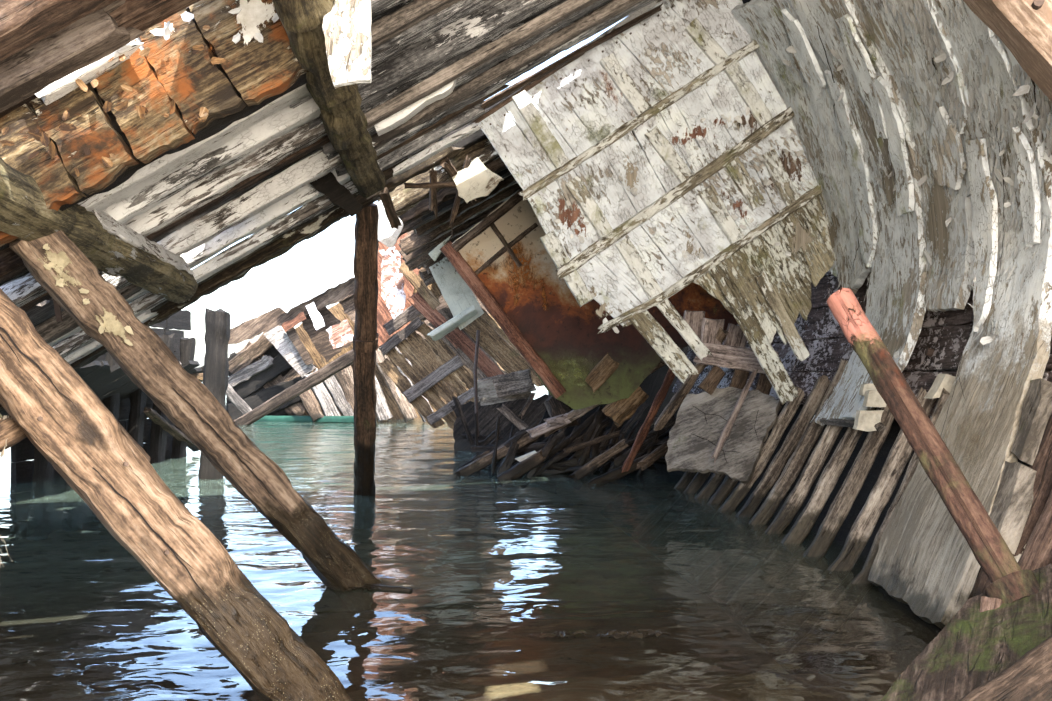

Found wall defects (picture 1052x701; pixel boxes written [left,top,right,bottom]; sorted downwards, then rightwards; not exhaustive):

peeling [229,0,279,46]
peeling [659,107,766,150]
peeling [618,159,639,196]
peeling [739,0,1052,359]
peeling [553,199,589,243]
peeling [671,217,704,259]
peeling [38,244,90,305]
peeling [95,307,134,346]
peeling [590,286,619,333]